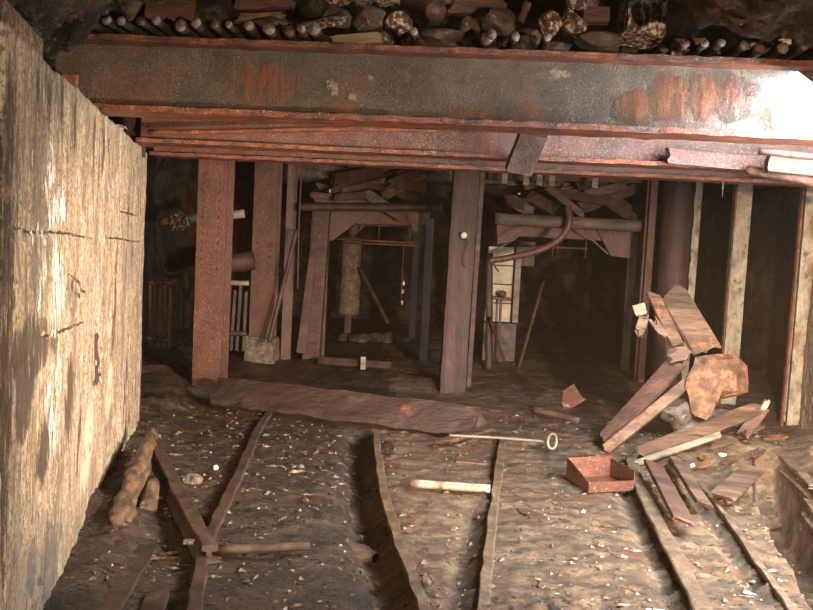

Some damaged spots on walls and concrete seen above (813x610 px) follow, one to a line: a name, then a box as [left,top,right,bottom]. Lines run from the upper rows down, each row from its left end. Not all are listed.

crack [10,227,141,242]